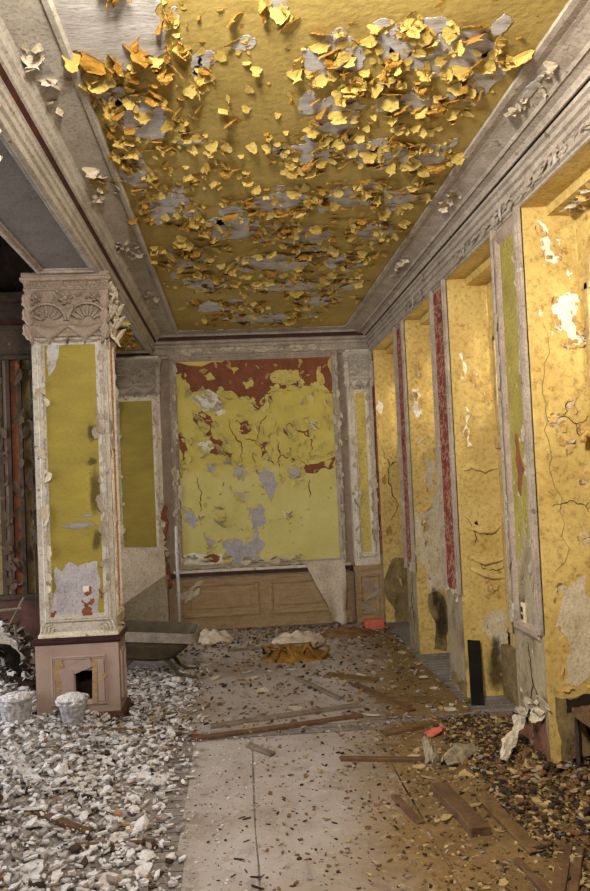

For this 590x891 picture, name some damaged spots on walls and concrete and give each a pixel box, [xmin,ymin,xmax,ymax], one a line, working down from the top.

peeling [503,61,558,120]
peeling [97,312,142,361]
peeling [20,0,535,328]
peeling [456,352,502,406]
peeling [447,120,590,265]
peeling [535,220,572,280]
peeling [539,291,586,350]
peeling [0,345,126,627]
crack [228,411,313,495]
peeling [152,344,461,651]
peeling [482,418,538,676]
peeling [515,574,590,773]